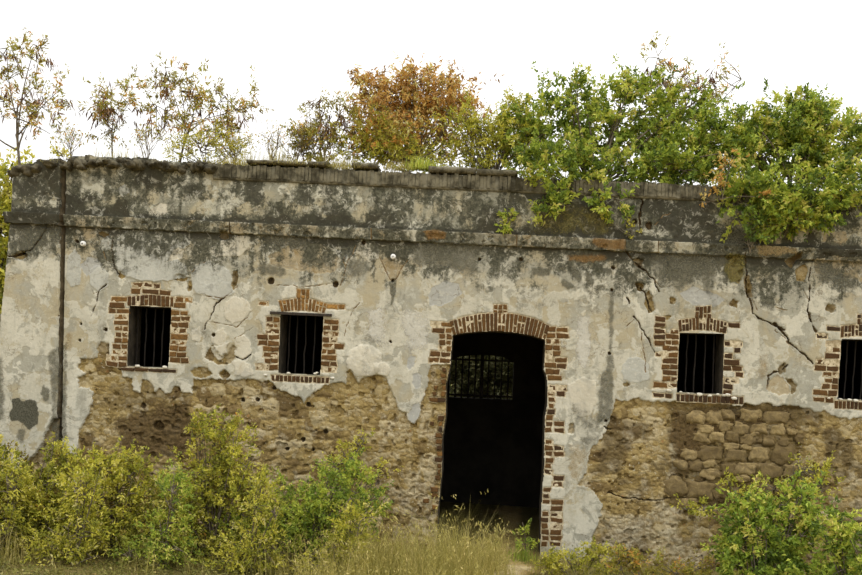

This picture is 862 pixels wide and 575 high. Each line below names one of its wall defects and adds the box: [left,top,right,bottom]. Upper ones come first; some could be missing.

crack [638,199,671,251]
damp [650,227,758,293]
crack [204,285,251,360]
crack [625,250,670,373]
crack [744,252,821,364]
damp [0,345,67,446]
flaking render [190,333,252,379]
flaking render [346,370,356,388]
peeling [408,403,421,424]